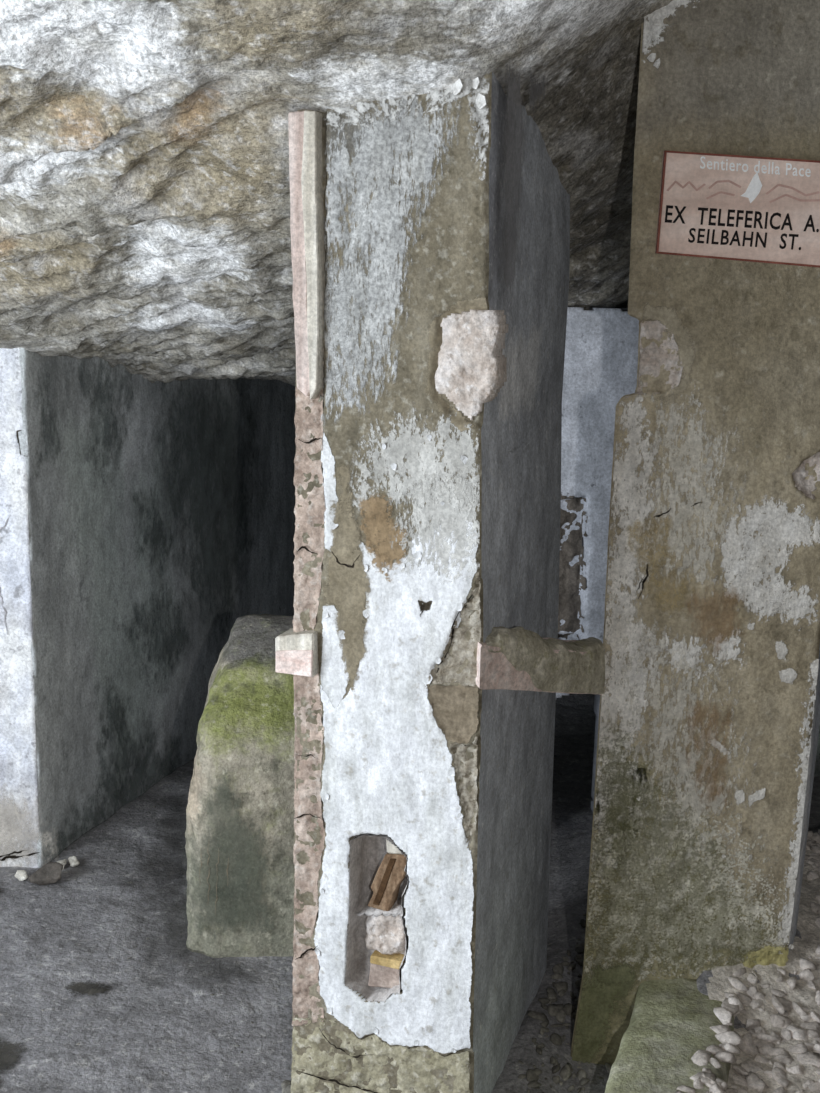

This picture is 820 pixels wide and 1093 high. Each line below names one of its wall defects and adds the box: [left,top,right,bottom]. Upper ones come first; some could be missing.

peeling [291,297,508,1093]